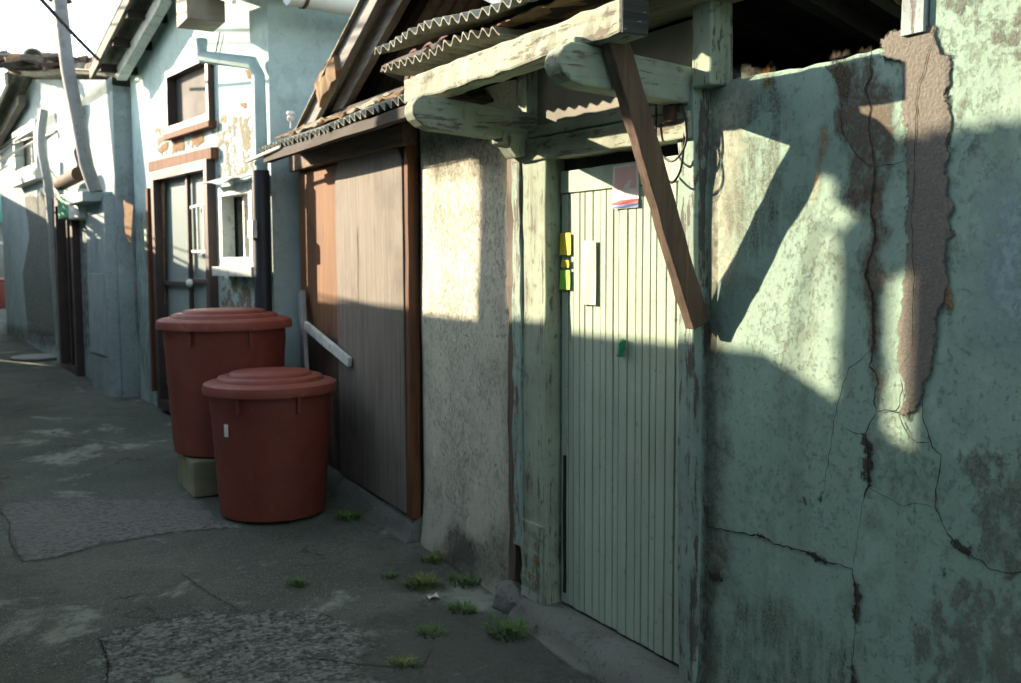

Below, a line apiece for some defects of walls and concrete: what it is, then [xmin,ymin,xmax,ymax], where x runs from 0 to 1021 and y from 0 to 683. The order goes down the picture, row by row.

peeling [154,102,254,181]
damp [832,53,894,349]
crack [707,32,1021,683]